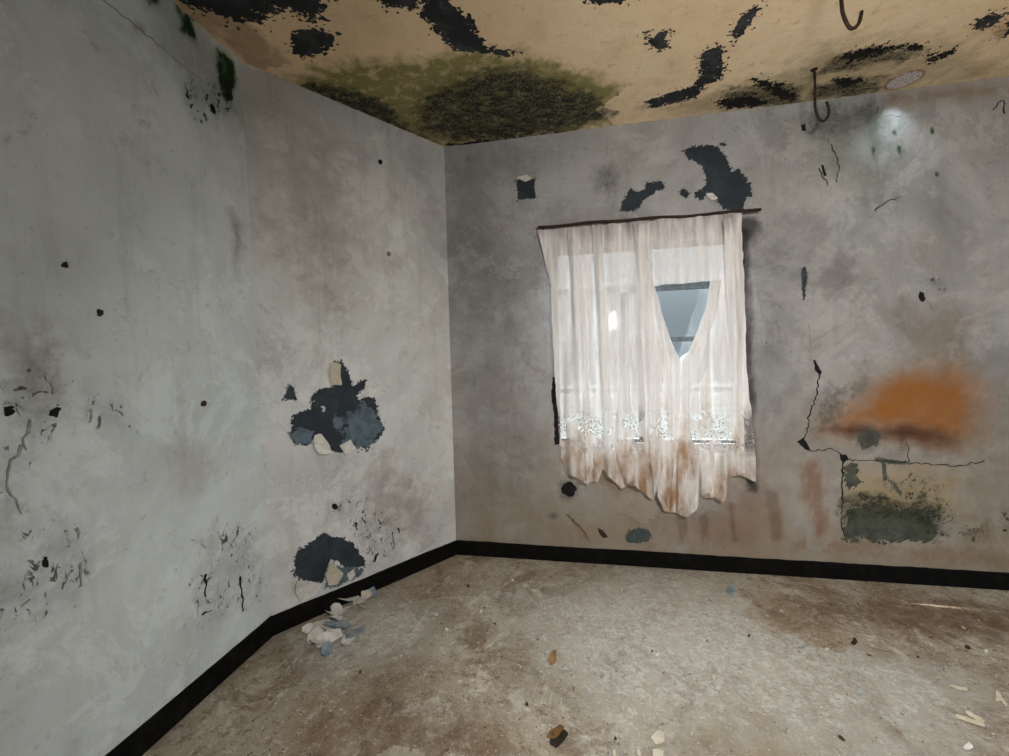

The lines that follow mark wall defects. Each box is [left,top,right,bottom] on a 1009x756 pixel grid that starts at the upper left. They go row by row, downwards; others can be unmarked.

peeling [178,0,342,62]
peeling [376,0,523,59]
damp [172,0,1009,147]
peeling [634,28,675,53]
peeling [644,0,768,108]
peeling [620,181,665,212]
peeling [678,141,753,213]
peeling [281,359,385,454]
crack [797,324,984,535]
rust [788,334,1009,553]
peeling [291,498,400,601]
damp [773,447,1009,573]